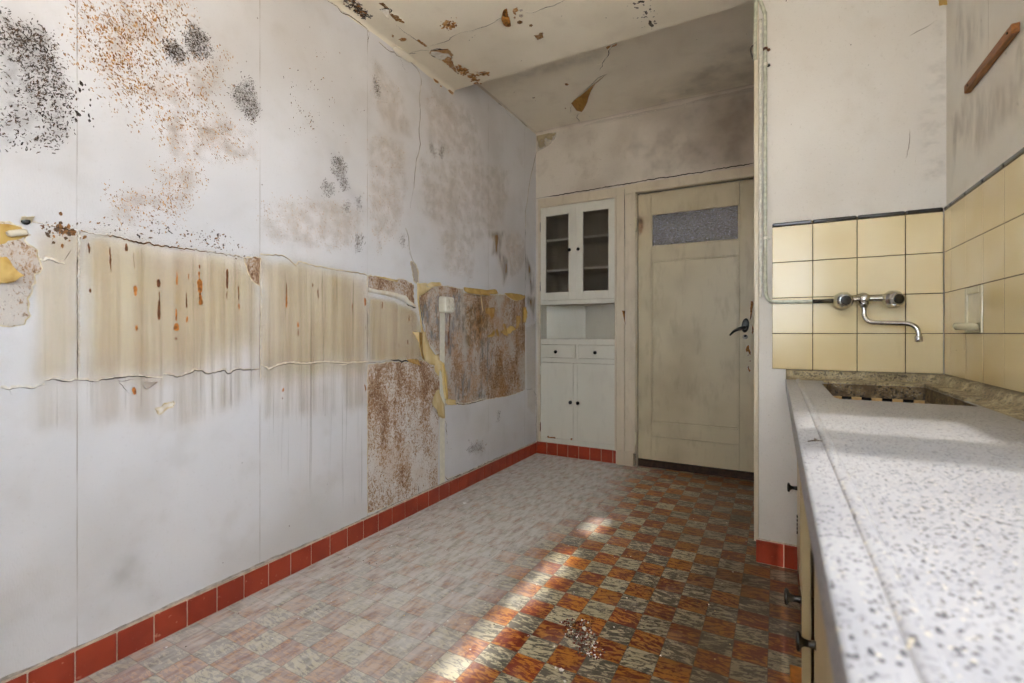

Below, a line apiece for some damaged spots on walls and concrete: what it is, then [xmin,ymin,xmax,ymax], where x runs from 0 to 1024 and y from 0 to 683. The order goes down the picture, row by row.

mould [0,6,94,154]
mould [160,20,214,66]
mould [227,71,262,125]
crack [326,0,566,271]
peeling [455,64,490,84]
corrosion [173,265,203,340]
crack [1,231,388,395]